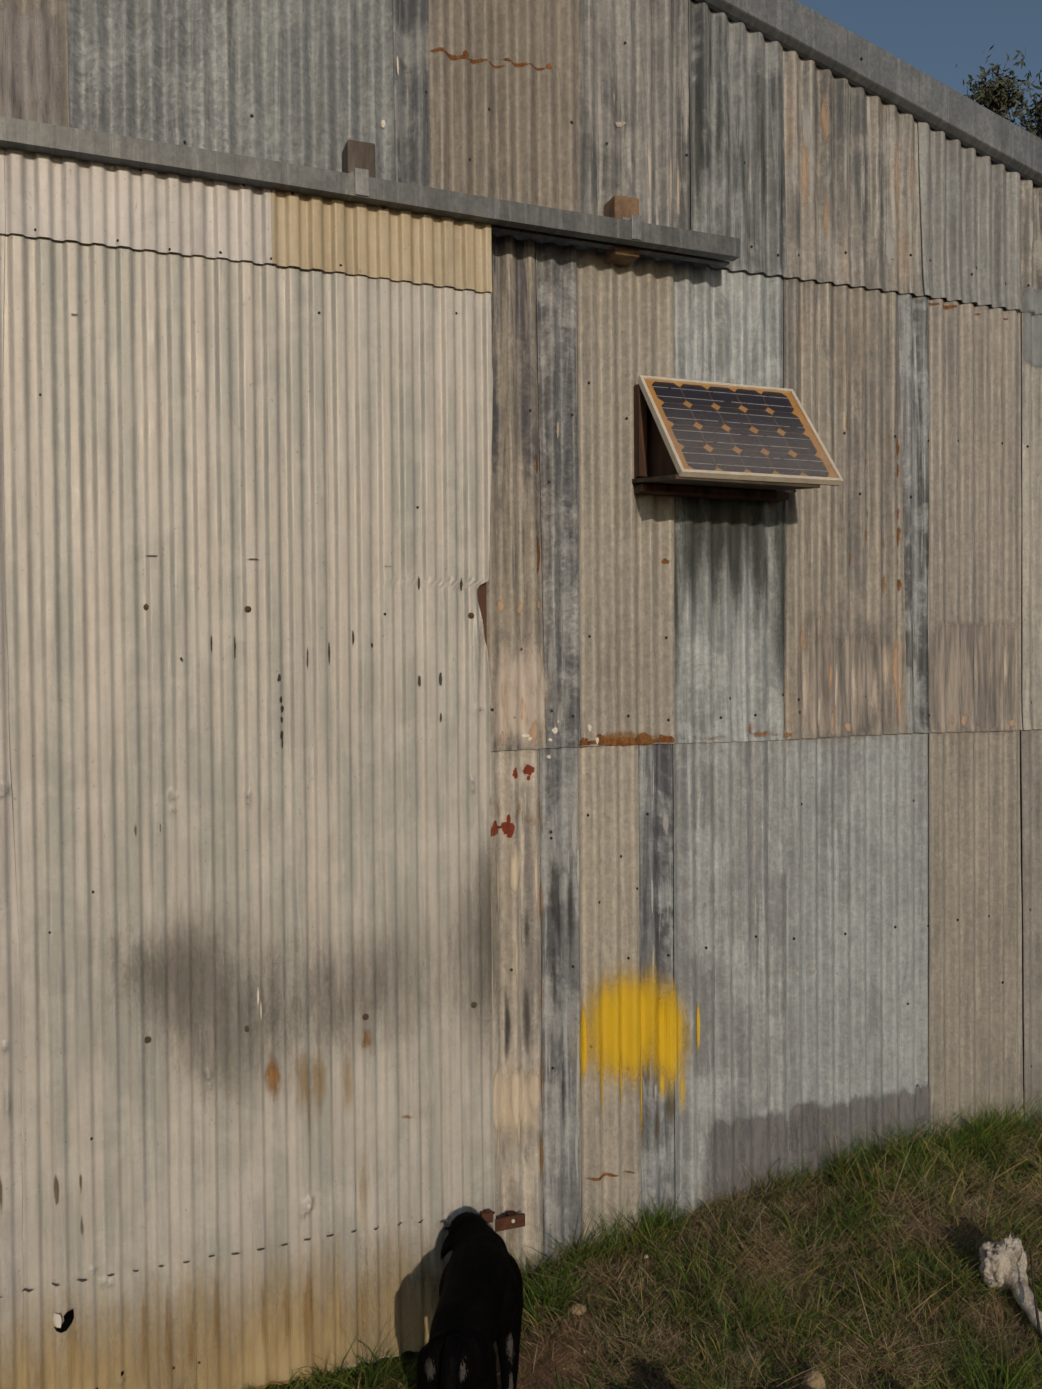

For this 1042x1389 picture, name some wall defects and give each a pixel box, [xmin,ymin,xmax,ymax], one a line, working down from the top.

rust [431,47,552,71]
water stain [675,497,1019,740]
rust [579,733,675,748]